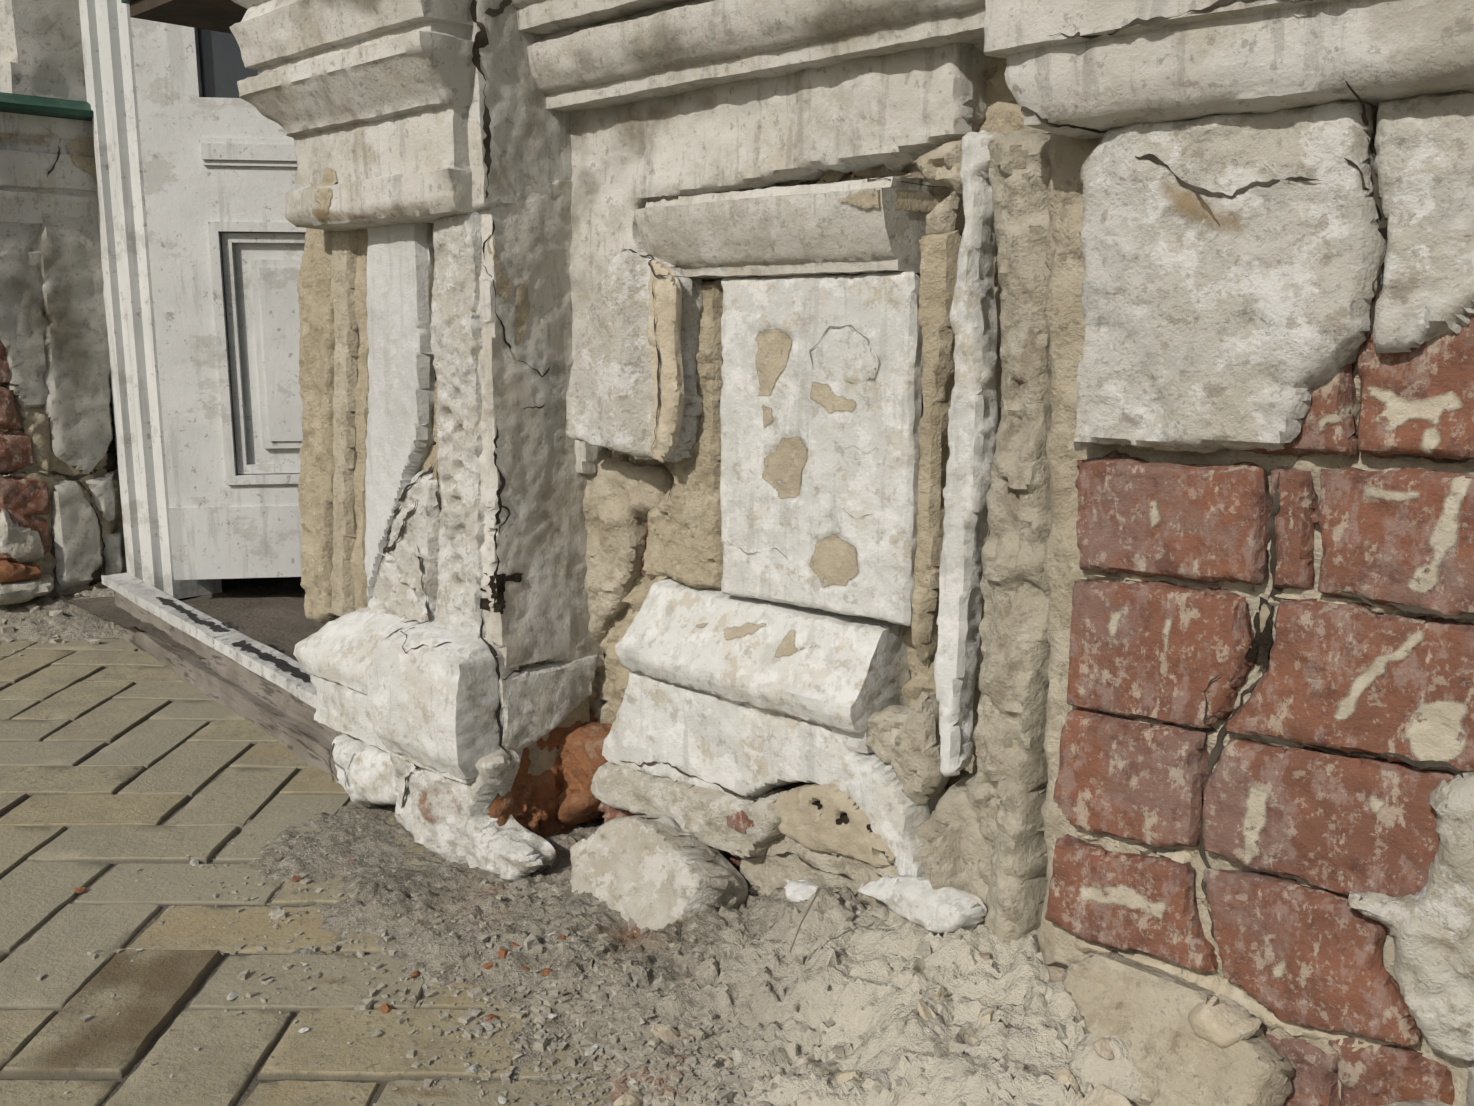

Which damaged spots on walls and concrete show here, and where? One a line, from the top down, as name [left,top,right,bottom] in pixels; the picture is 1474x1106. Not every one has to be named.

crack [1049,0,1313,39]
crack [1021,106,1108,133]
crack [1135,81,1388,350]
crack [377,0,551,769]
flaking render [756,329,792,428]
crack [0,378,118,572]
flaking render [762,436,807,499]
peeling [1364,486,1419,501]
peeling [1421,427,1441,454]
crack [50,519,59,585]
flaking render [810,534,859,588]
spalling [556,722,612,827]